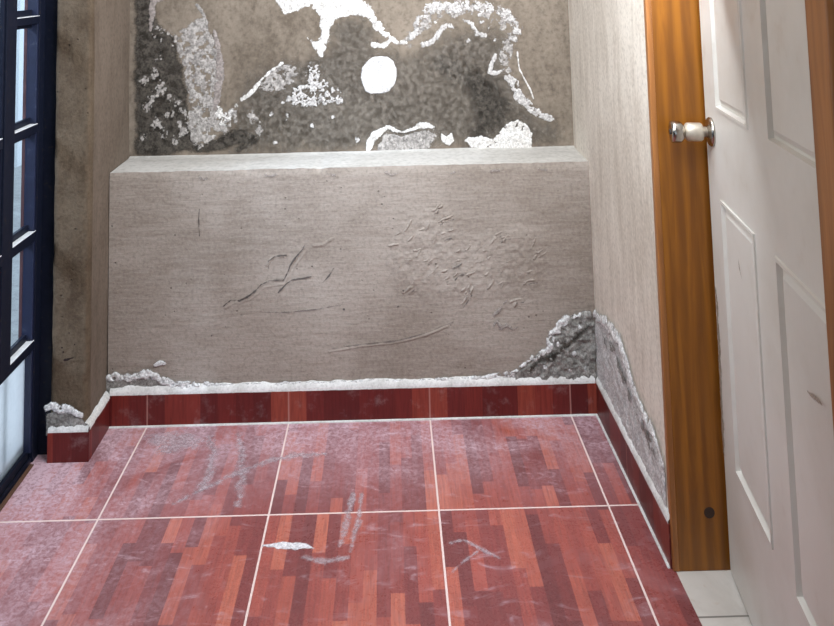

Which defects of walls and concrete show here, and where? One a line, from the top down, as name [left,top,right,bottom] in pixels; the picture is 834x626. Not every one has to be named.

peeling [276,0,408,57]
peeling [366,122,454,152]
peeling [465,120,532,148]
crack [223,237,335,313]
flaking render [106,360,214,393]
flaking render [44,402,87,436]
flaking render [511,309,666,507]